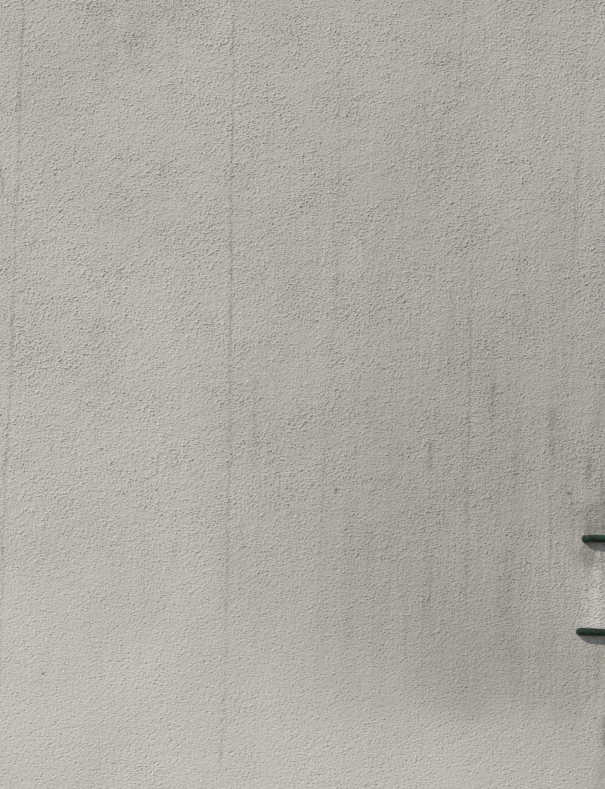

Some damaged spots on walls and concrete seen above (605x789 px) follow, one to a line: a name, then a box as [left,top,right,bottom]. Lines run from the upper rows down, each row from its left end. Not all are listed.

leakage [575,549,605,640]